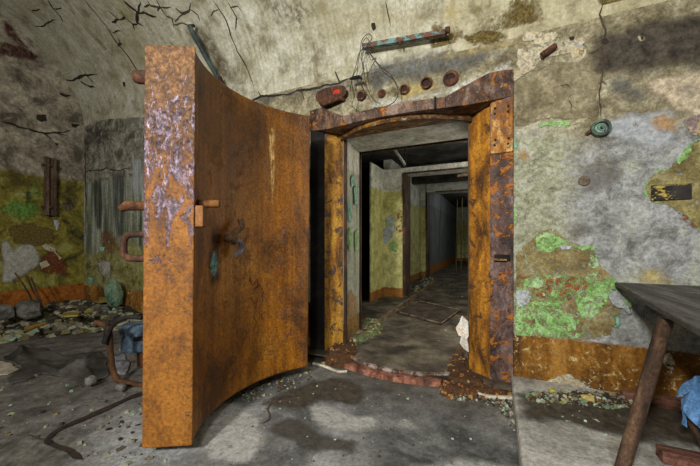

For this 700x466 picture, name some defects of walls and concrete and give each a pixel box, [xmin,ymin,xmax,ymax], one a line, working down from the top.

crack [66,74,97,88]
crack [86,0,350,100]
flaking render [513,30,587,81]
crack [589,5,607,114]
crack [1,121,128,222]
peeling [644,115,700,231]
spalling [2,241,39,282]
peeling [514,229,633,341]